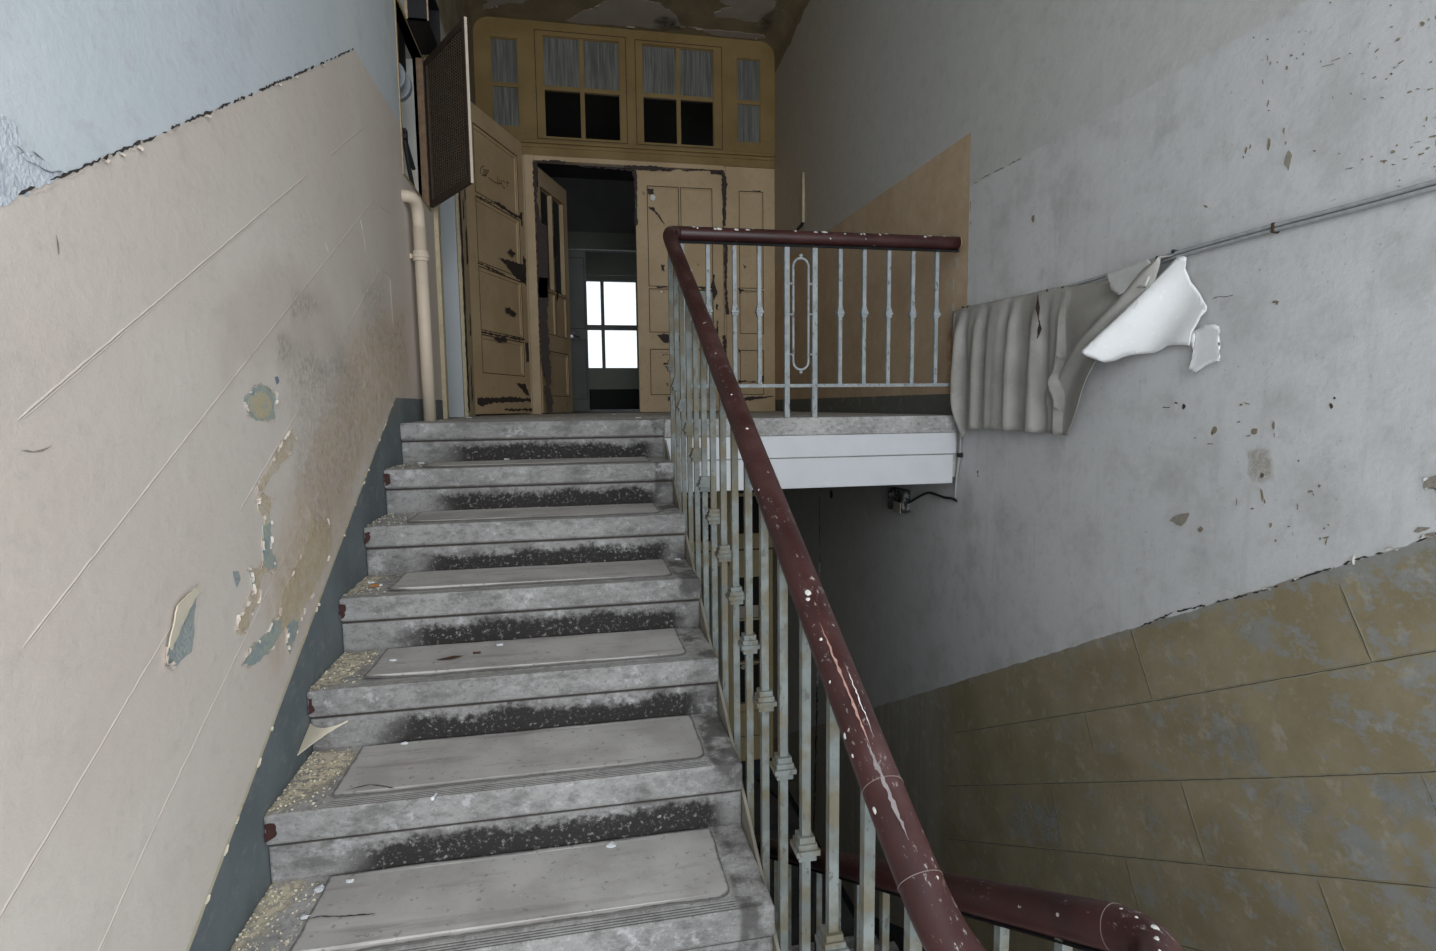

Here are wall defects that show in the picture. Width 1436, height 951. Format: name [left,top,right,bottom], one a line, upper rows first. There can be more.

flaking render [566,0,776,40]
flaking render [0,115,63,206]
peeling [243,382,278,423]
flaking render [1423,475,1436,489]
peeling [232,427,348,668]
peeling [165,587,202,670]